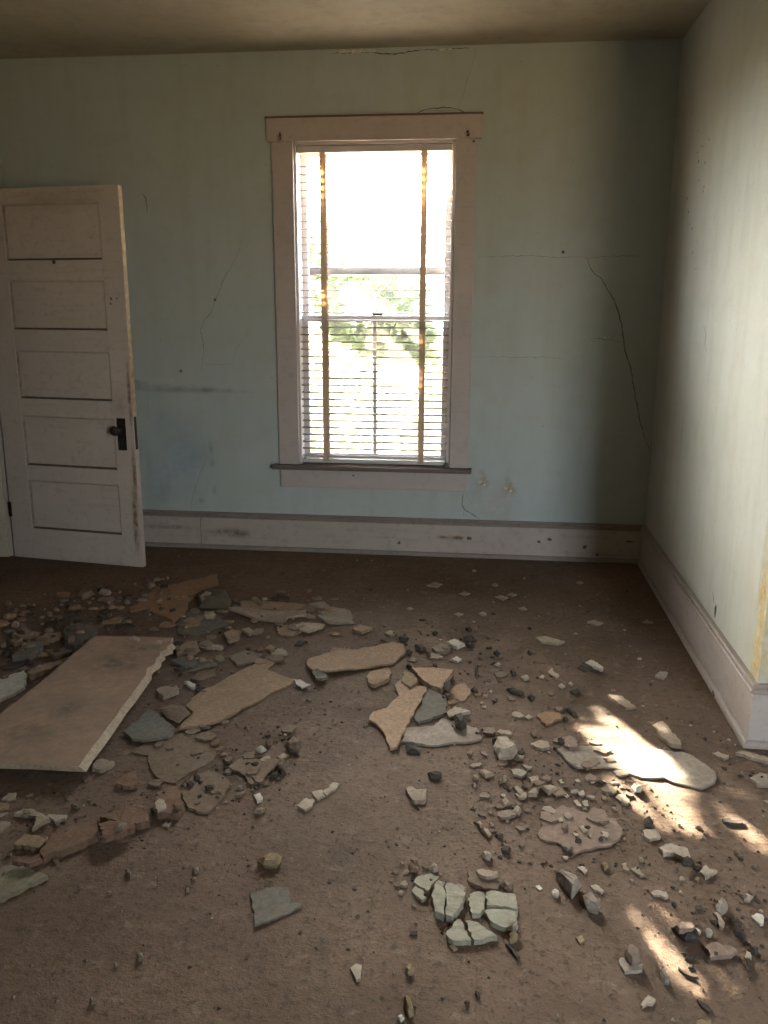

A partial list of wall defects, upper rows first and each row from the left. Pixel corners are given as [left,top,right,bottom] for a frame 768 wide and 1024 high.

crack [477,255,650,450]